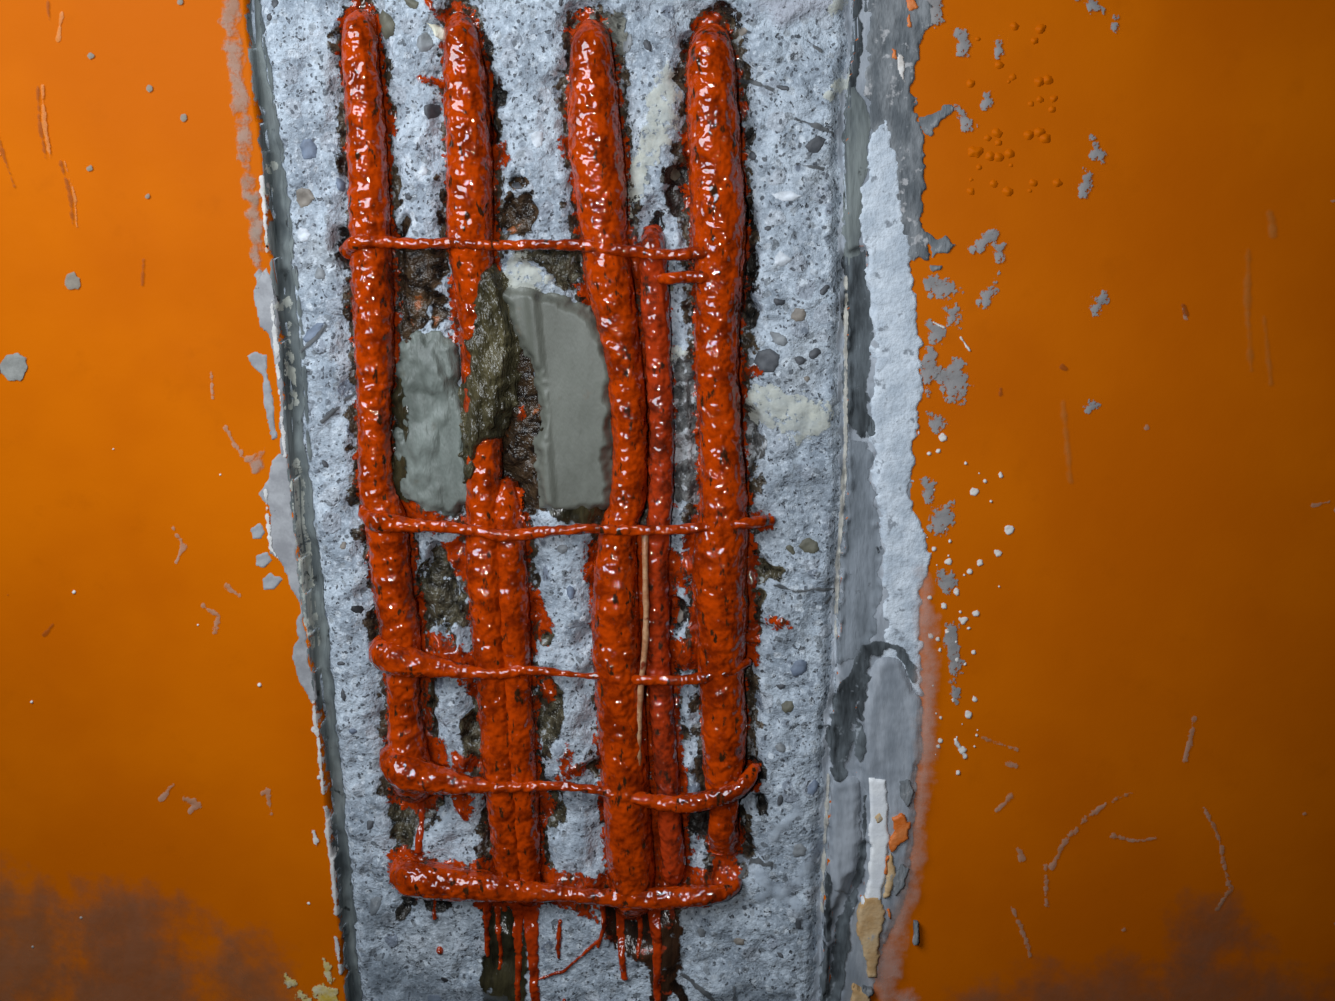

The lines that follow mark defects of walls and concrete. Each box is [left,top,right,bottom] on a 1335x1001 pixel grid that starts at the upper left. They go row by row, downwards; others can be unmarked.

spalling [479,29,508,146]
spalling [392,216,451,343]
spalling [497,176,584,291]
spalling [648,164,689,231]
spalling [743,176,760,329]
peeling [0,353,27,381]
spalling [502,350,548,516]
spalling [671,355,699,504]
peeling [241,175,343,916]
spalling [411,538,467,647]
peeling [811,0,1007,1001]
spalling [536,675,565,753]